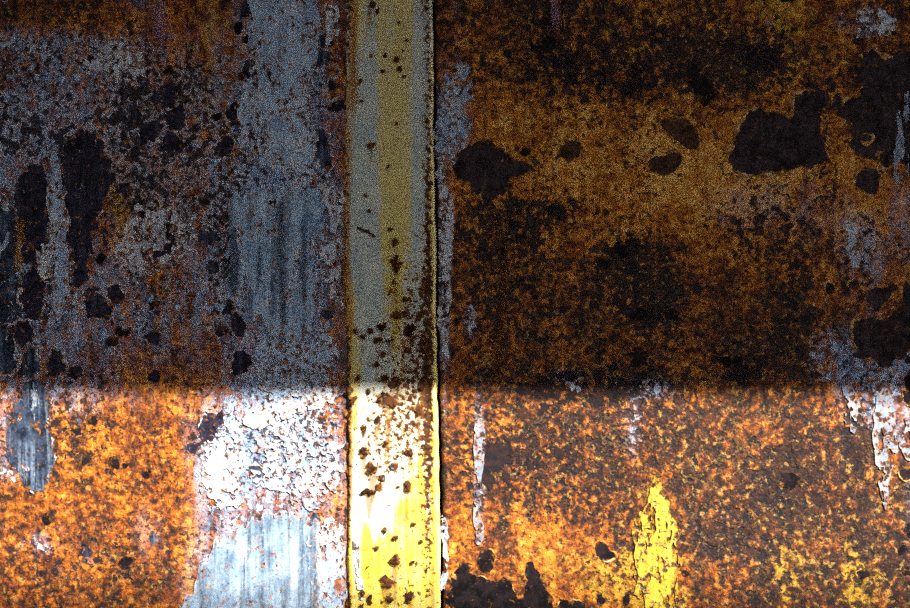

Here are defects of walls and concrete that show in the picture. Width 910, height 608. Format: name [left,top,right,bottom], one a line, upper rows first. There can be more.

peeling [726,7,910,199]
peeling [0,0,364,608]
corrosion [345,590,373,608]
corrosion [342,196,427,496]
corrosion [379,574,397,603]
corrosion [389,554,415,567]
peeling [432,59,533,380]
peeling [440,423,586,608]
corrosion [481,439,581,493]
corrosion [512,361,647,422]
peeling [623,486,689,608]
peeling [841,220,910,509]